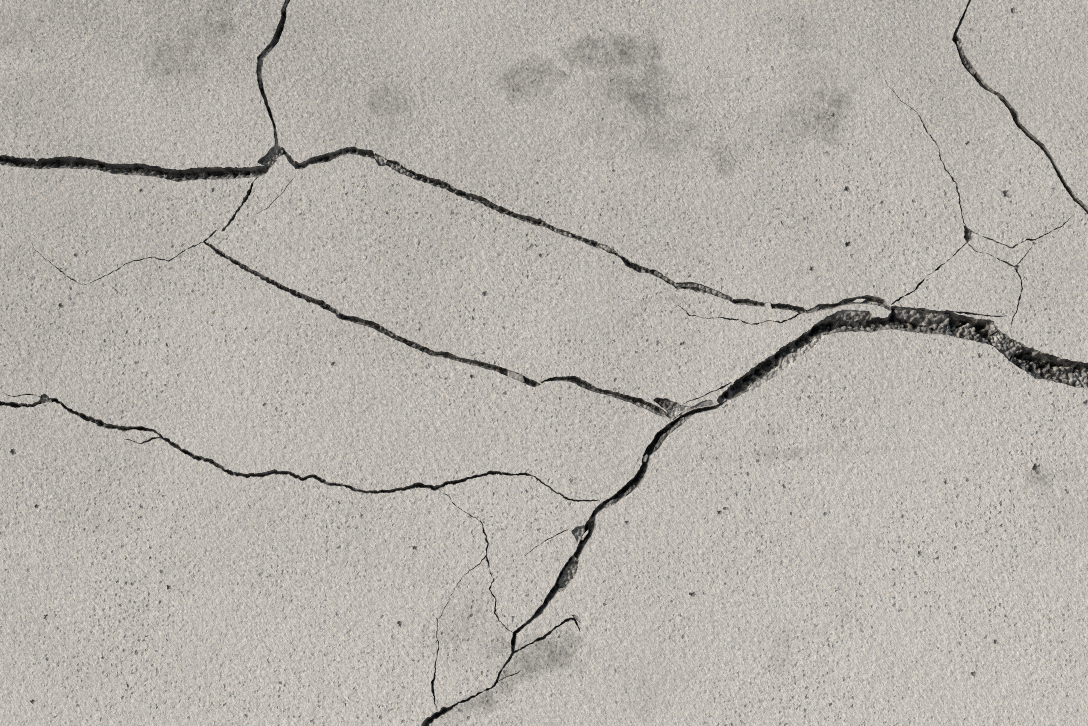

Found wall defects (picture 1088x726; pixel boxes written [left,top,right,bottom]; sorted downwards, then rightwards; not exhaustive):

crack [0,0,891,325]
crack [885,80,1073,337]
crack [952,0,1088,214]
crack [0,230,1088,726]